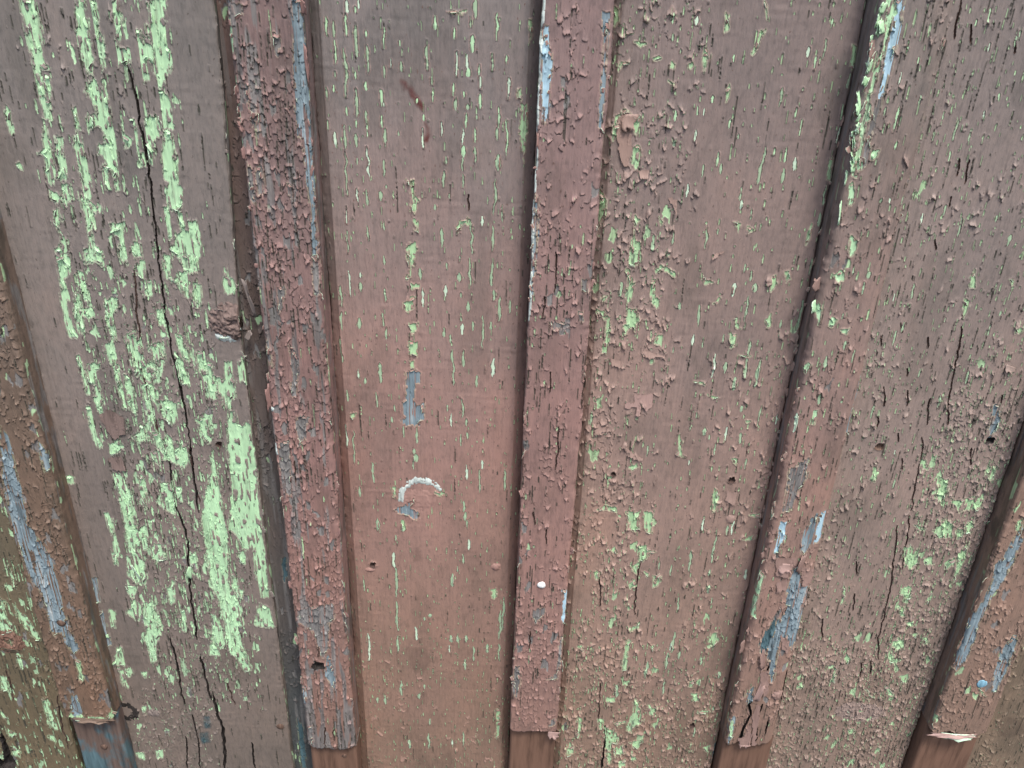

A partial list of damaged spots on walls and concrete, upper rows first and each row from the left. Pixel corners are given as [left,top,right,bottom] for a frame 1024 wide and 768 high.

peeling [272,0,323,300]
spalling [325,0,387,205]
peeling [440,0,553,386]
peeling [836,0,919,225]
peeling [0,433,83,681]
peeling [19,0,274,688]
crack [126,56,236,768]
peeling [382,323,445,651]
peeling [597,633,681,768]
peeling [701,452,826,757]
peeling [929,713,977,742]
peeling [953,520,1024,670]